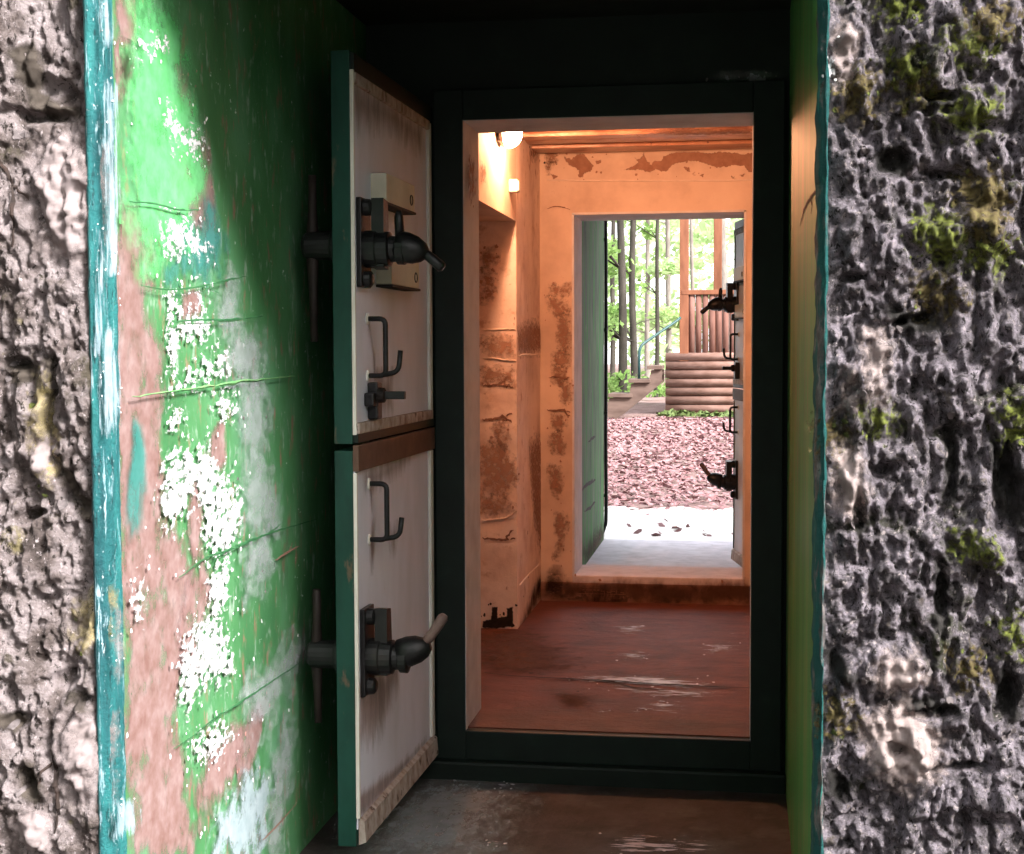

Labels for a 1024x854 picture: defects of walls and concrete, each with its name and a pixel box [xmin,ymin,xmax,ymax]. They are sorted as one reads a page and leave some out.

peeling [564,153,607,180]
peeling [626,151,752,180]
peeling [94,0,274,854]
water stain [481,503,750,674]